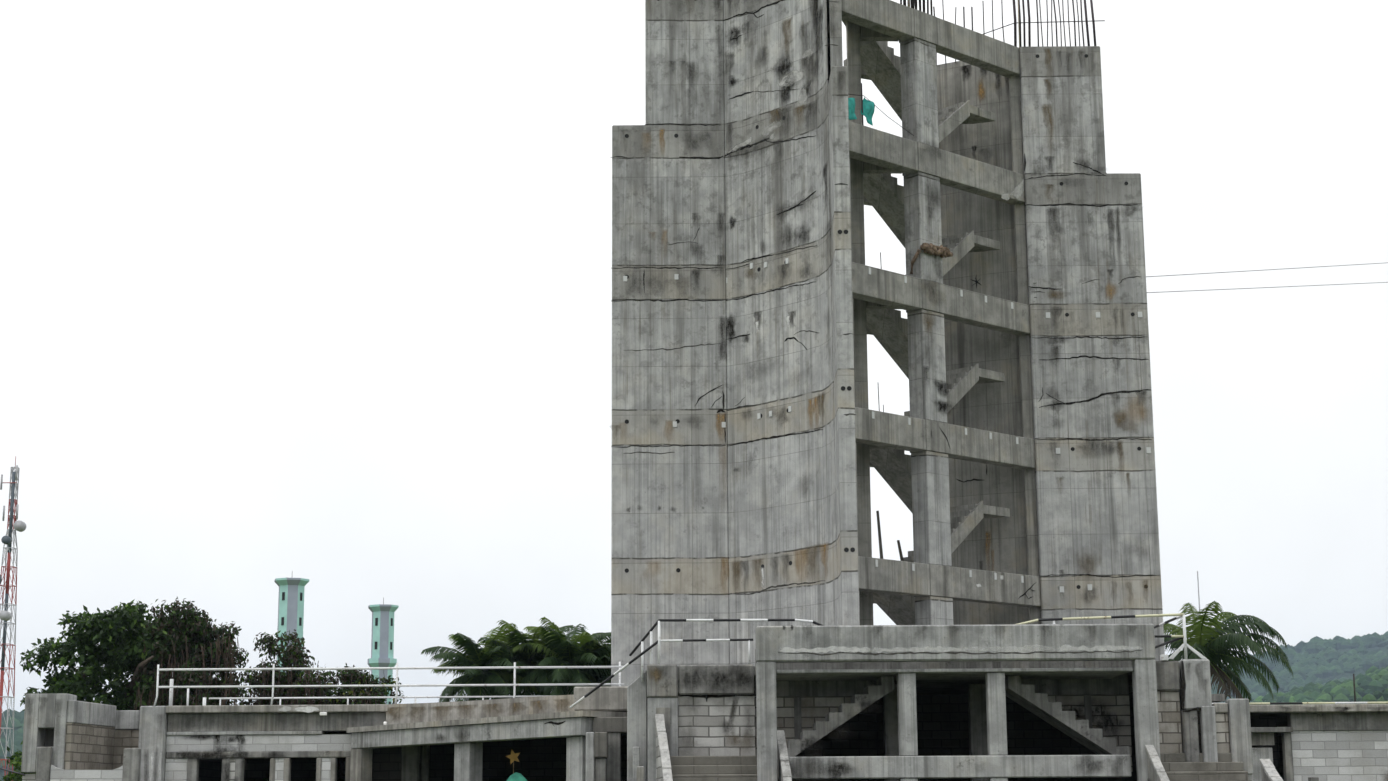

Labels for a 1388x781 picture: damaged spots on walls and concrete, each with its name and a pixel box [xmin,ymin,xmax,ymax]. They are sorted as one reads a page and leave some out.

crack [777,183,847,215]
crack [615,229,817,302]
crack [633,343,721,351]
crack [784,330,852,350]
crack [622,385,856,454]
crack [1032,336,1152,441]